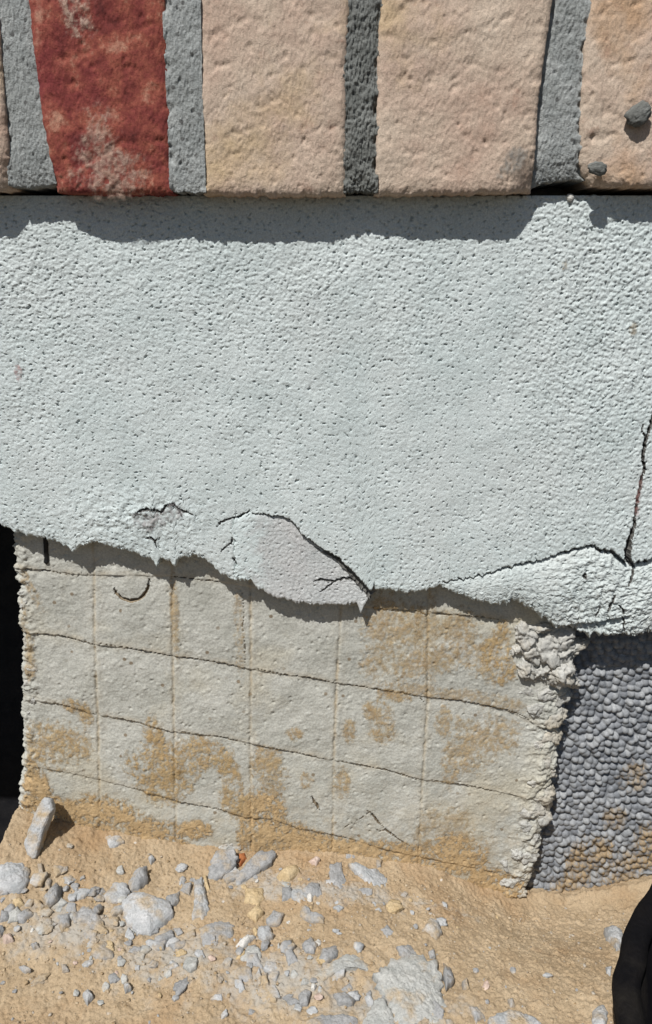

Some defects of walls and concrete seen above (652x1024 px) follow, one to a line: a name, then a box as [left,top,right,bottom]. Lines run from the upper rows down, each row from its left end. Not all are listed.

spalling [113,578,150,603]
crack [135,503,193,548]
crack [219,511,249,564]
flaking render [230,511,373,613]
crack [290,519,485,618]
crack [469,415,652,632]
spalling [495,620,590,898]